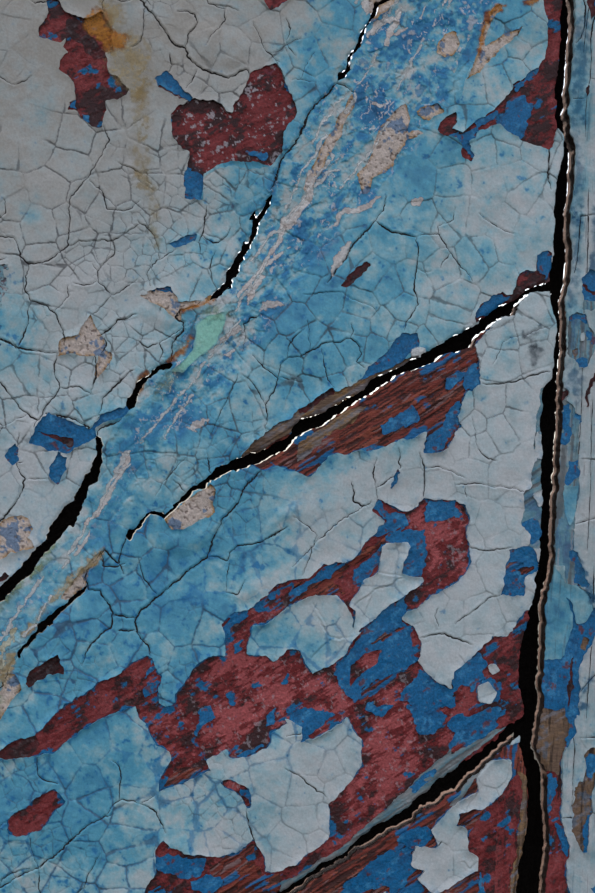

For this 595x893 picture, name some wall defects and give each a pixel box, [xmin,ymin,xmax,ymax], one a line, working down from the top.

peeling [38,0,129,128]
rust [83,1,150,98]
peeling [154,64,297,200]
peeling [436,0,562,161]
crack [554,0,568,133]
crack [0,0,390,602]
crack [572,189,594,273]
peeling [253,329,489,477]
crack [17,141,569,893]
peeling [536,271,595,893]
peeling [0,498,529,893]
crack [567,647,595,819]